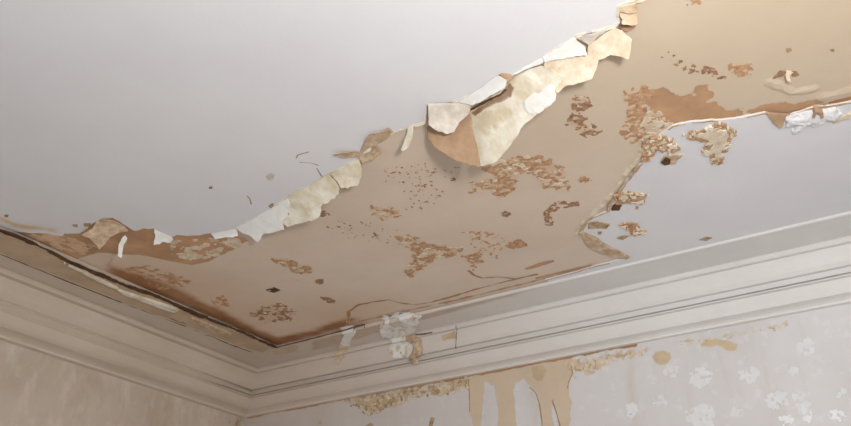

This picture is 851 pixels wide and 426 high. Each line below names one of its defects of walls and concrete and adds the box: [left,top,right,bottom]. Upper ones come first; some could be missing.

flaking render [72,0,851,365]
peeling [566,345,654,378]
damp [651,349,672,367]
damp [700,338,740,352]
peeling [345,376,470,426]
damp [468,358,574,426]
peeling [764,390,813,426]